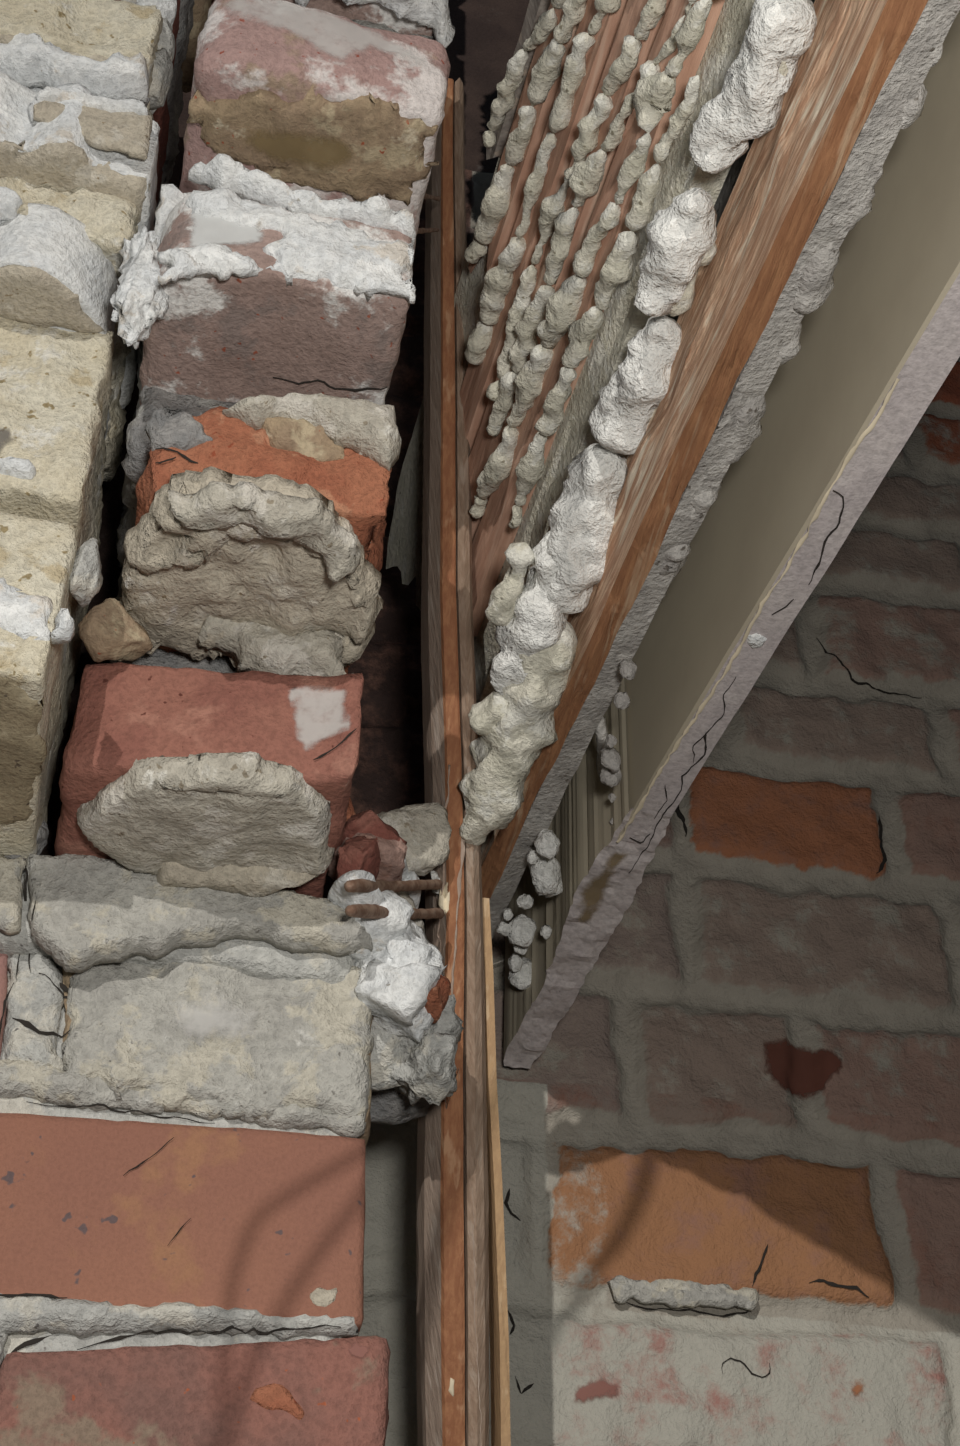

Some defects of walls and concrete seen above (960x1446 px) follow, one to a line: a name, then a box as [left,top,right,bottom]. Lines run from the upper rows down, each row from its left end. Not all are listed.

crack [772,490,844,615]
crack [817,638,919,699]
crack [629,677,736,873]
crack [26,1101,204,1176]
crack [613,1244,768,1317]
crack [809,1279,869,1298]
crack [721,1357,771,1378]